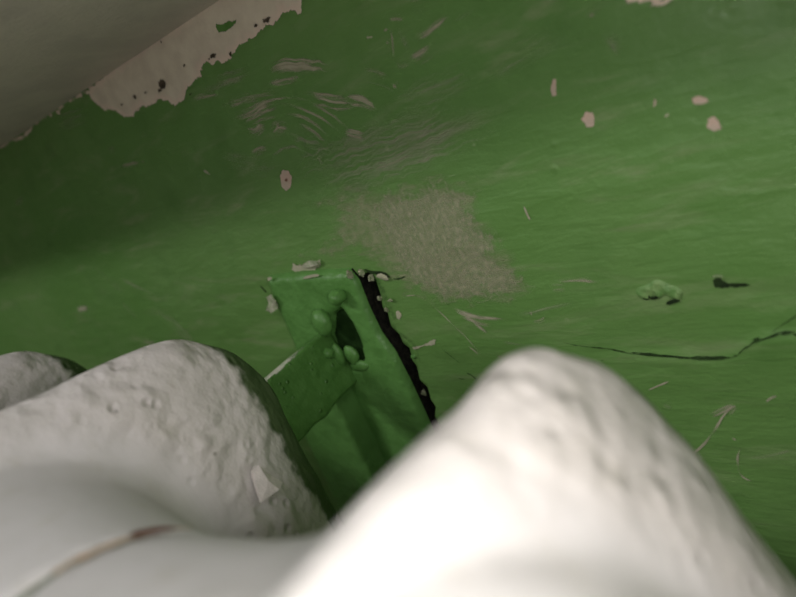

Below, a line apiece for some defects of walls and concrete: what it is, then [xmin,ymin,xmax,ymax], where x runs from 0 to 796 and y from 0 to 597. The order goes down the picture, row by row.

peeling [0,0,302,148]
peeling [581,112,594,127]
peeling [692,96,708,104]
peeling [280,170,292,191]
crack [346,269,405,316]
crack [567,316,796,360]